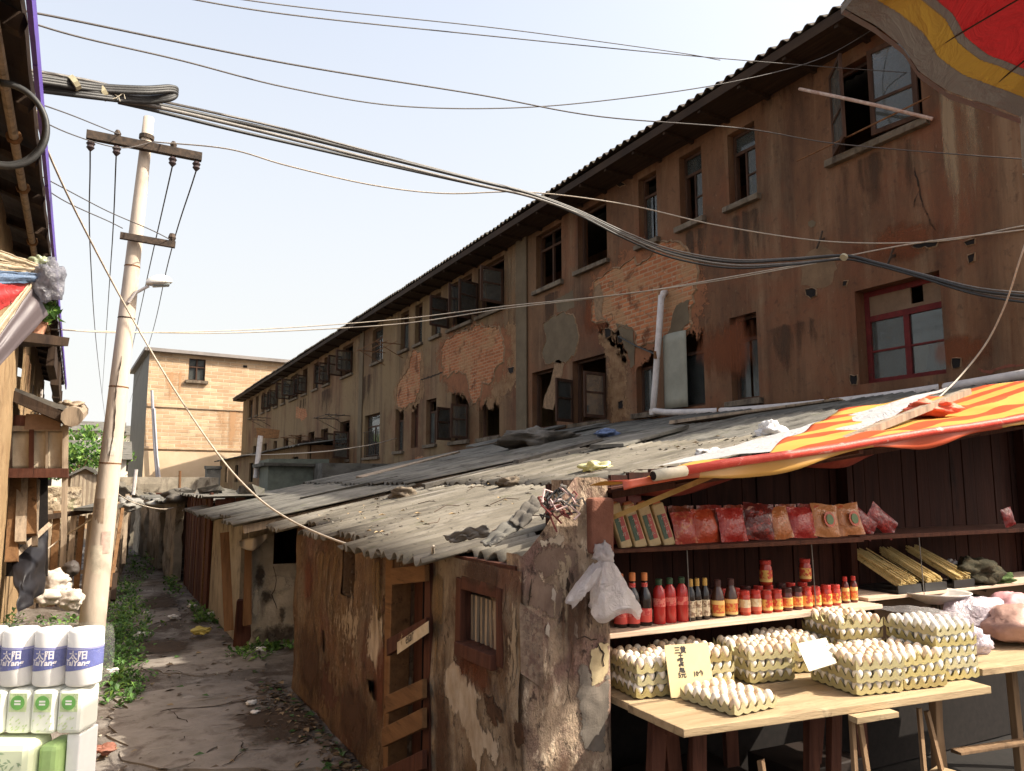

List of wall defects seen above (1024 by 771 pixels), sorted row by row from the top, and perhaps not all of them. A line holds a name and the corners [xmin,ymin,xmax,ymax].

crack [914,168,935,230]
spalling [393,316,528,414]
spalling [588,237,711,423]
spalling [534,535,578,637]